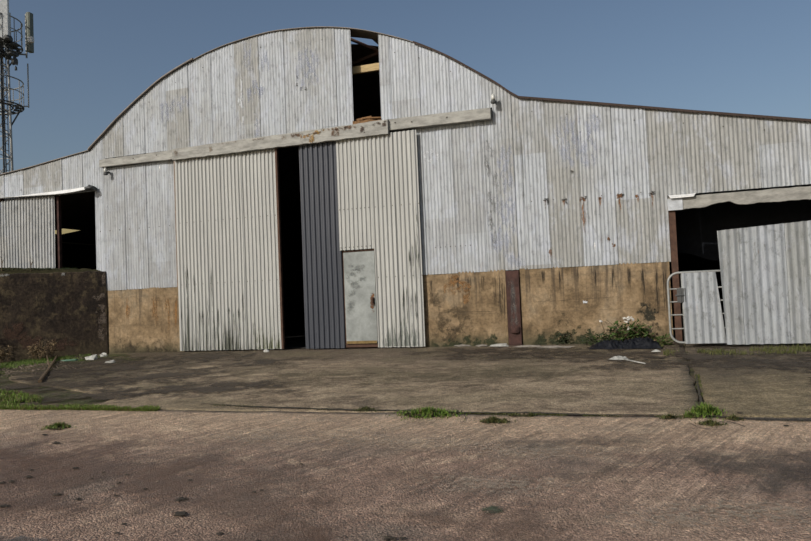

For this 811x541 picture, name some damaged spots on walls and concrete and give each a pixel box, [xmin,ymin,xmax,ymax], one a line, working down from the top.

leakage [116,299,257,353]
leakage [385,288,419,346]